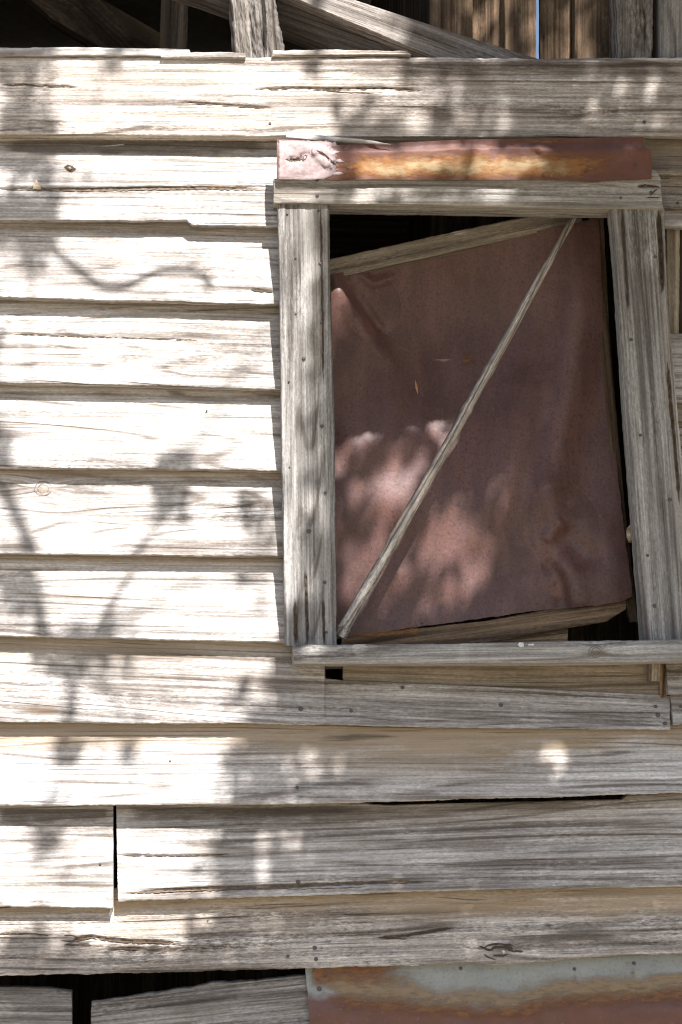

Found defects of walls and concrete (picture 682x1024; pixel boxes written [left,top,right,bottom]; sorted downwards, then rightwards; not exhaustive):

peeling [279,140,343,179]
rust [347,156,599,176]
rust [313,966,682,1018]